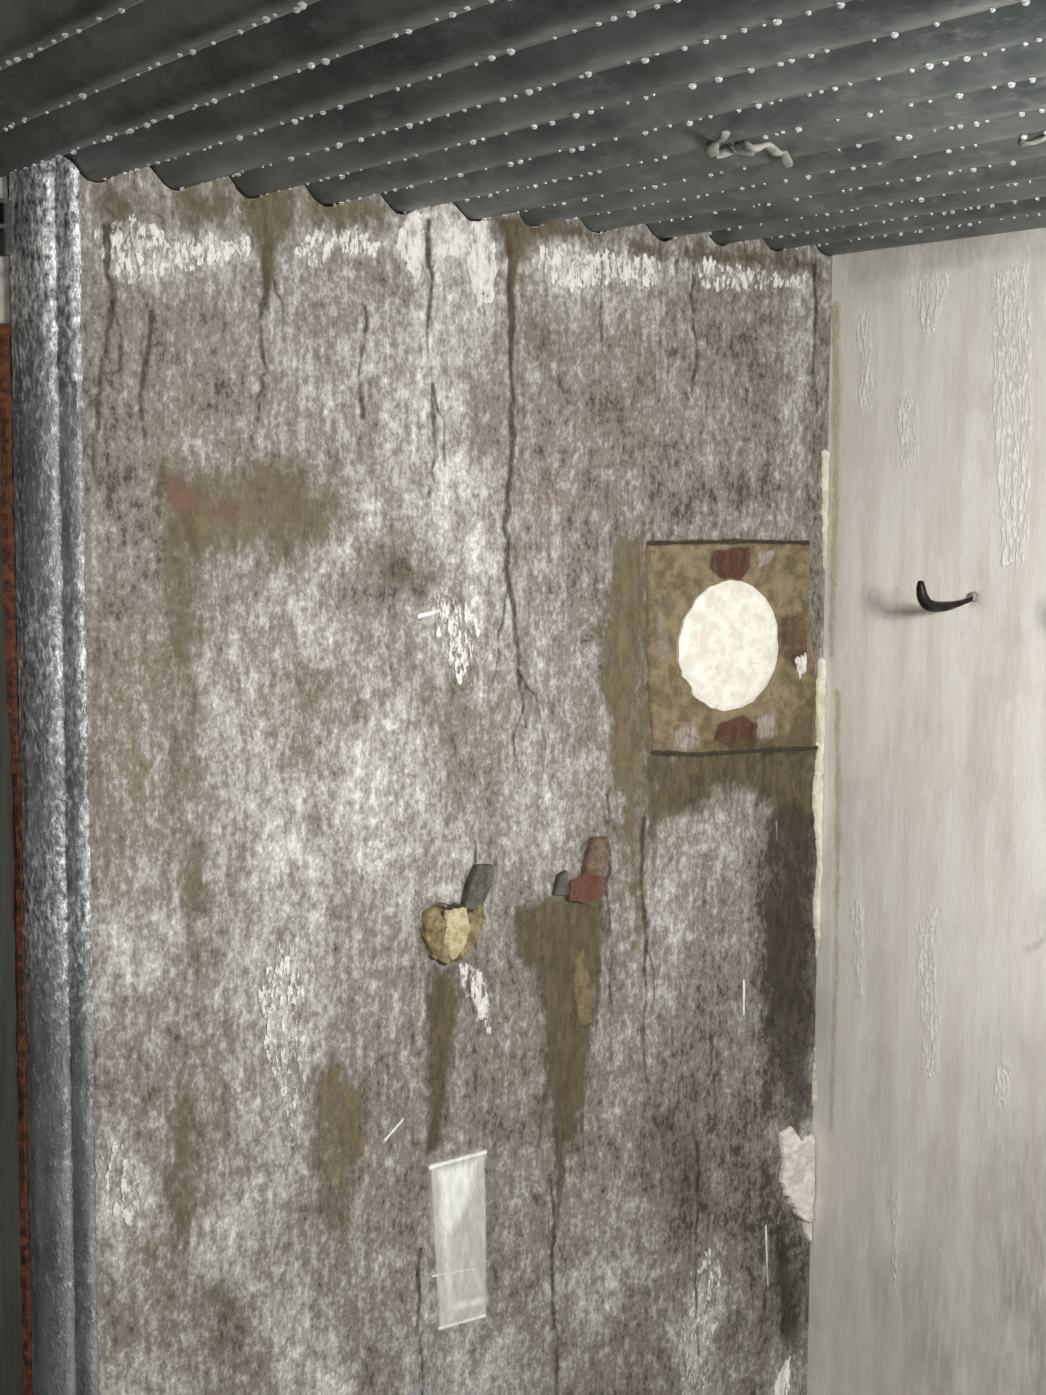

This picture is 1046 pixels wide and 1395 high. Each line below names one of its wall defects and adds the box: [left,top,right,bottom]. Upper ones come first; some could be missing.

crack [91,224,154,467]
crack [258,250,276,395]
crack [358,306,368,417]
crack [426,219,434,329]
crack [429,385,445,493]
crack [497,221,537,746]
spalling [421,901,491,1034]
damp [426,966,470,1152]
damp [517,897,608,1218]
crack [551,1179,559,1382]
peeling [802,1221,812,1242]